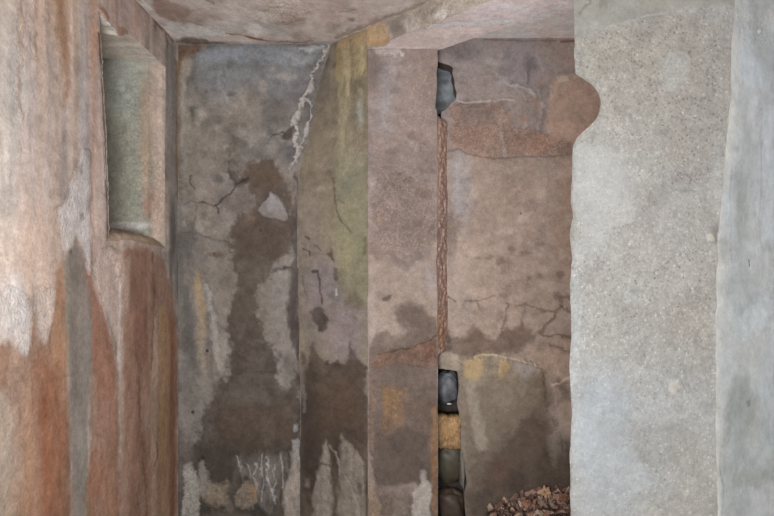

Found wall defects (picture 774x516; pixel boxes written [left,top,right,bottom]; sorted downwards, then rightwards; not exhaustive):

corrosion [0,256,70,516]
corrosion [87,241,178,516]
crack [179,150,250,244]
water stain [139,0,437,516]
crack [447,294,571,354]